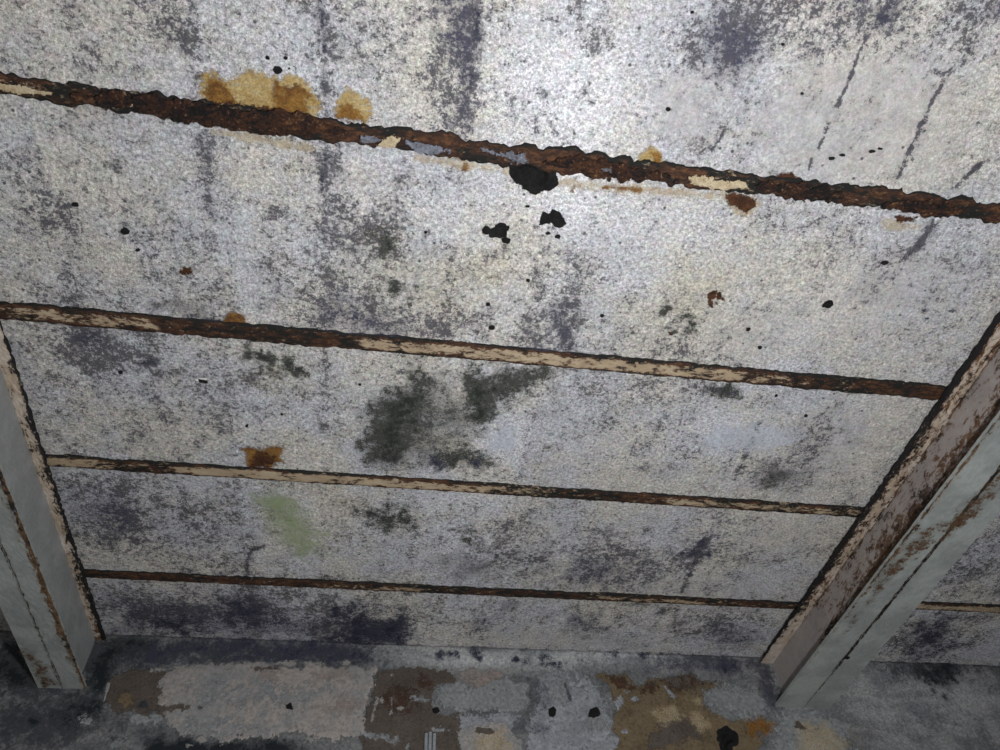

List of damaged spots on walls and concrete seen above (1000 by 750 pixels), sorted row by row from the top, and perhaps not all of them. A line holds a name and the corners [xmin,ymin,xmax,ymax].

corrosion [71,69,373,137]
peeling [405,139,451,156]
hole [509,164,559,208]
hole [539,209,566,239]
corrosion [542,146,678,192]
corrosion [719,172,845,214]
corrosion [881,199,965,223]
corrosion [223,313,247,323]
mould [354,355,555,476]
corrosion [239,445,285,469]